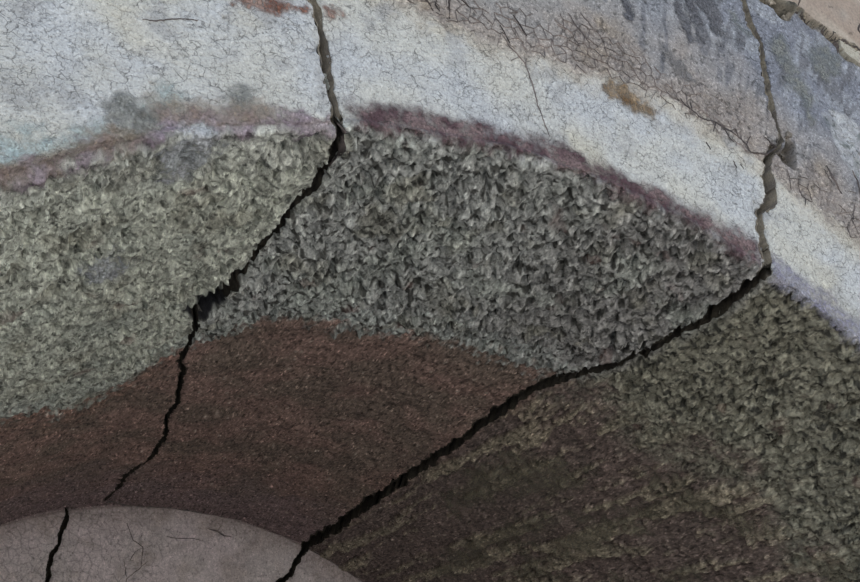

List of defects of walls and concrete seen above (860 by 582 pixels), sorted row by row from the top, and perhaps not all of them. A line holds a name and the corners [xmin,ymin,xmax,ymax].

crack [142,16,198,24]
rust [231,0,309,17]
spalling [759,0,800,22]
spalling [838,40,860,67]
crack [217,0,346,297]
crack [276,0,860,582]
crack [104,304,231,582]
crack [45,508,69,582]